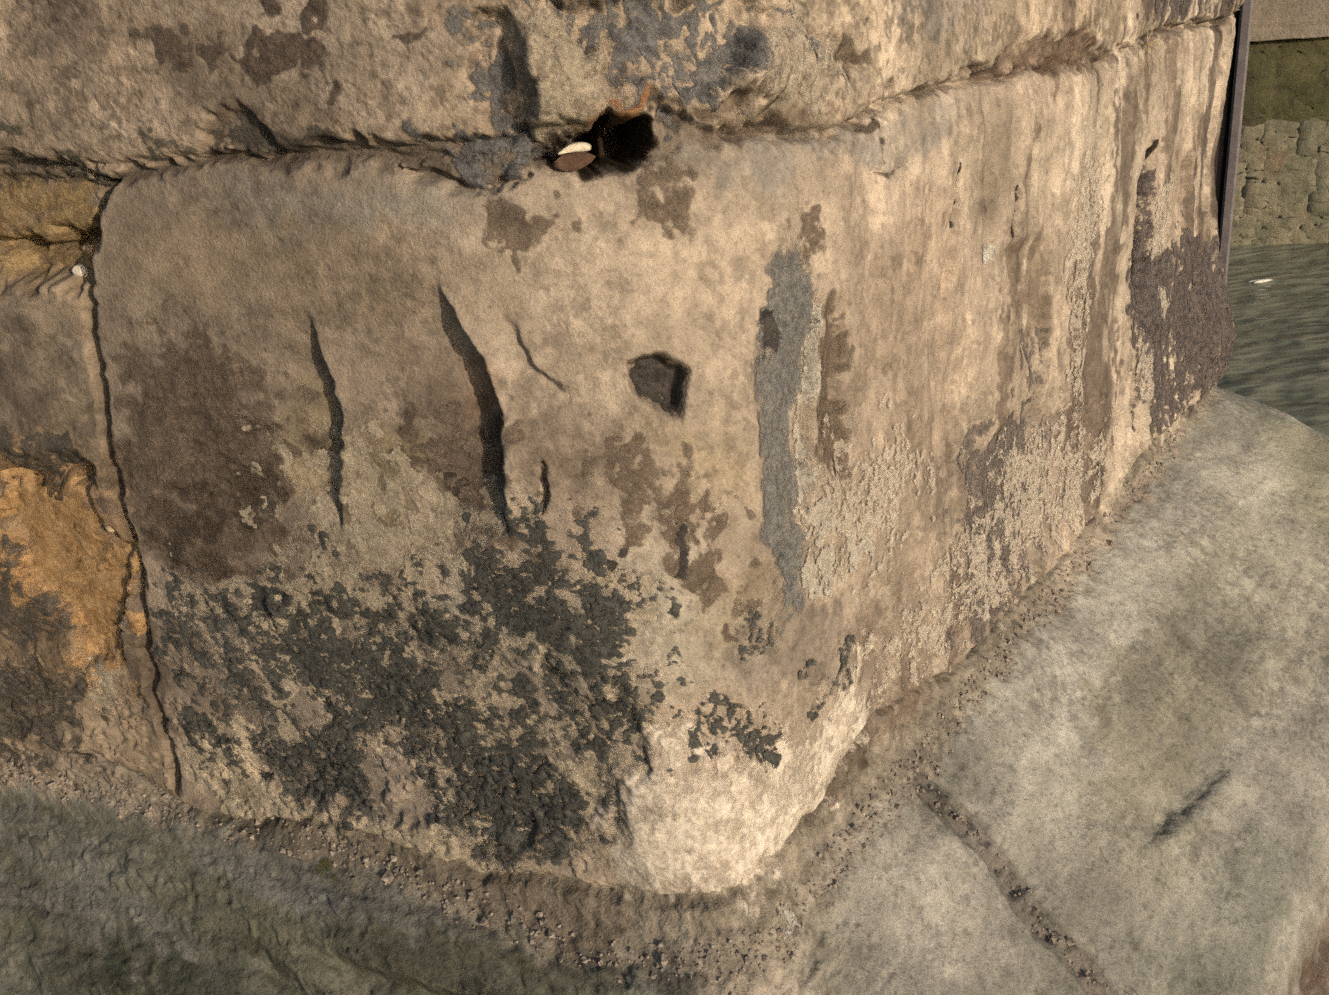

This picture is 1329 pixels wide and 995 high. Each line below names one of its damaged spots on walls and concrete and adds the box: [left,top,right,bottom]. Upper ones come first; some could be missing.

rust [581,86,652,135]
peeling [0,304,1116,897]
water stain [570,431,763,642]
water stain [740,204,855,641]
water stain [1061,146,1112,426]
water stain [1130,163,1210,402]
peeling [1126,210,1237,453]